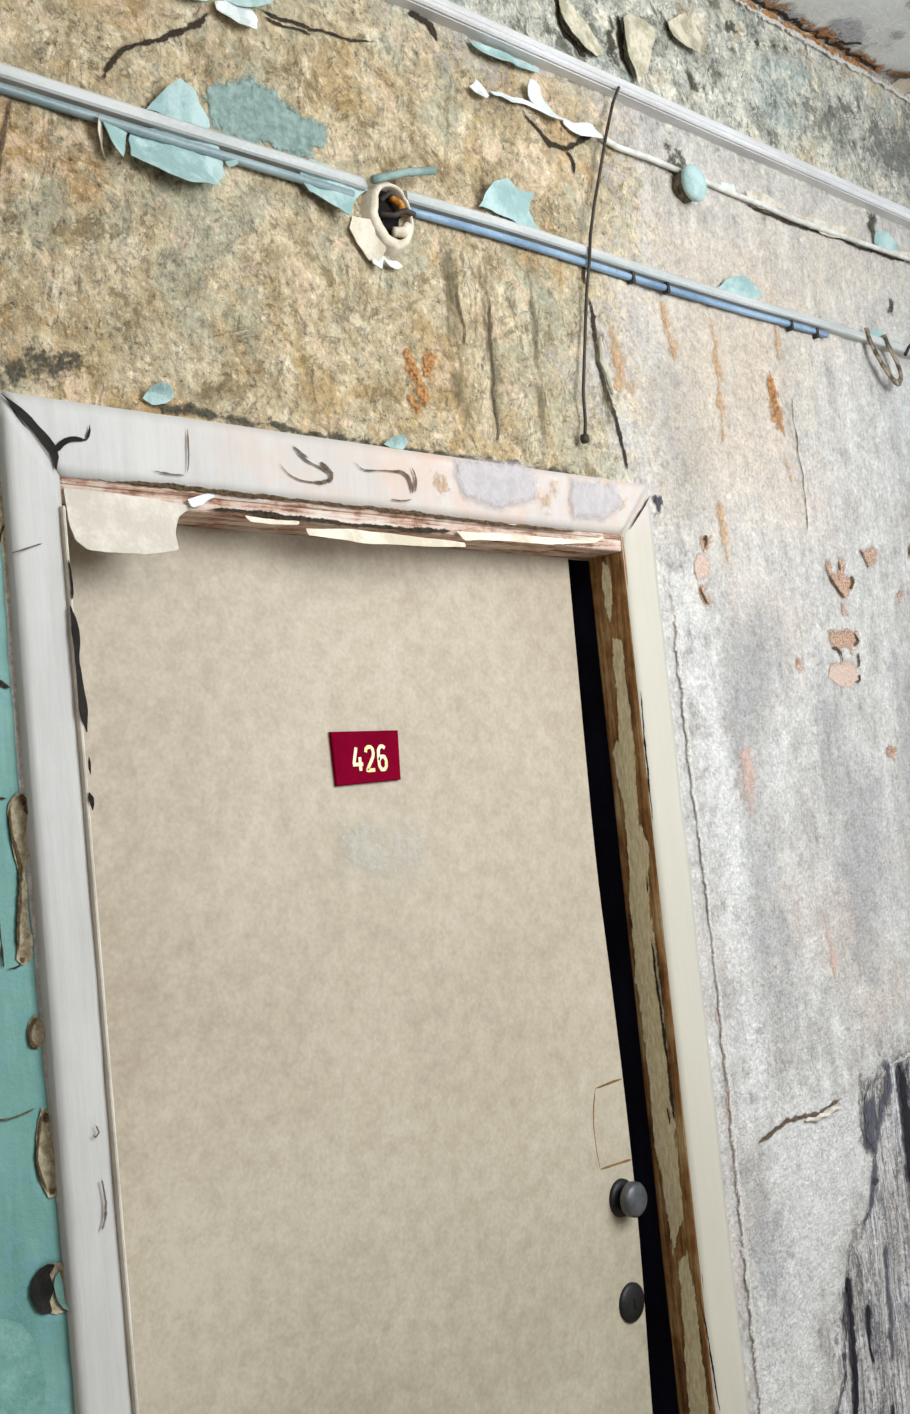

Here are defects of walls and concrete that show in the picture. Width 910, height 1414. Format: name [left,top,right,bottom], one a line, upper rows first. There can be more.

crack [103,13,208,79]
crack [261,9,372,42]
crack [555,0,633,77]
flaking render [623,12,701,84]
water stain [726,20,789,53]
corrosion [739,0,910,82]
peeling [97,78,238,185]
water stain [664,139,686,179]
water stain [867,212,877,234]
corrosion [403,348,436,414]
peeling [63,461,626,554]
flaking render [829,1044,910,1414]